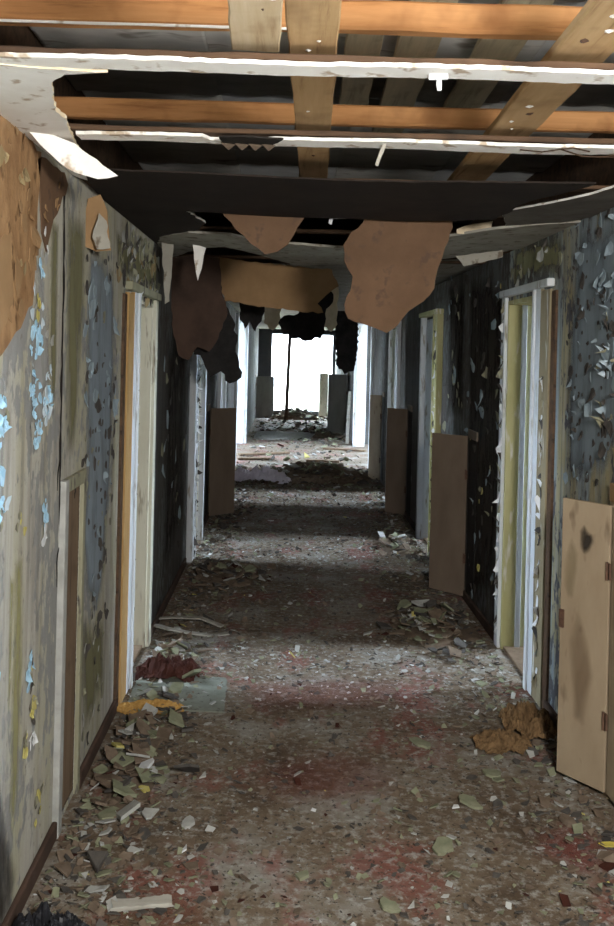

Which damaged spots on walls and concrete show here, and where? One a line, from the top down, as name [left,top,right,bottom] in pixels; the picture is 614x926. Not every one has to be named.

spalling [0,115,68,450]
spalling [219,135,284,151]
peeling [432,237,562,634]
peeling [563,209,614,494]
peeling [531,560,539,690]